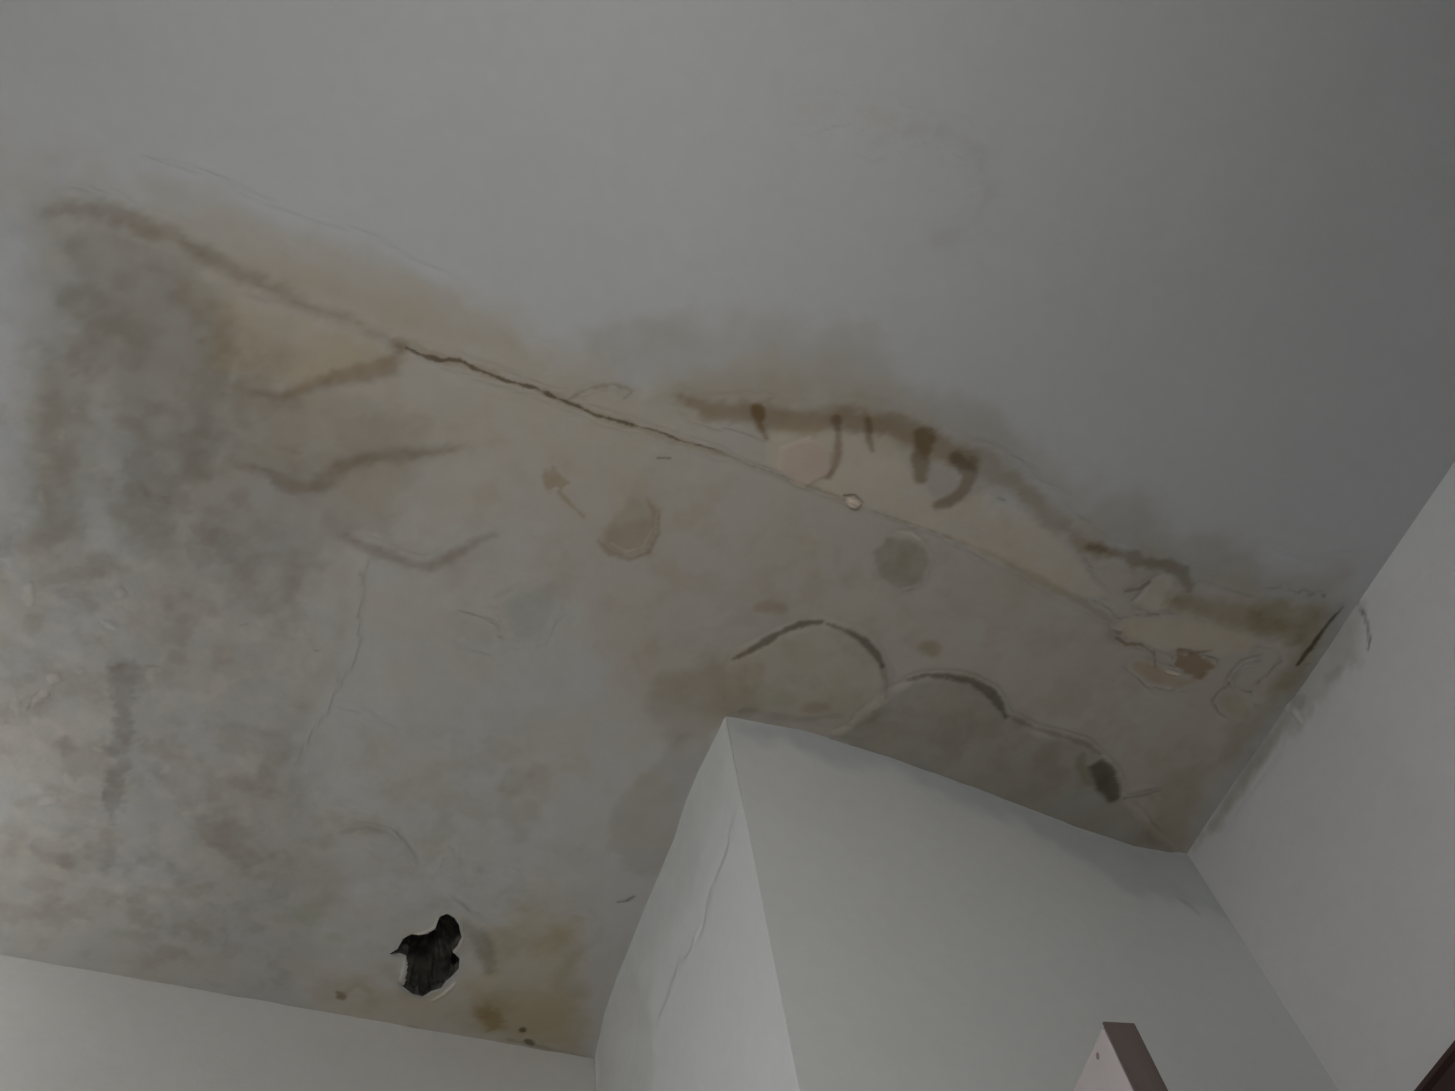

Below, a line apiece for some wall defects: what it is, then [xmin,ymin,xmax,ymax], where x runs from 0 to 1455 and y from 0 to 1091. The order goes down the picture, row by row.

crack [387,332,818,493]
spalling [594,490,669,566]
damp [0,92,1374,1004]
spalling [390,914,461,1002]
damp [595,718,741,1091]